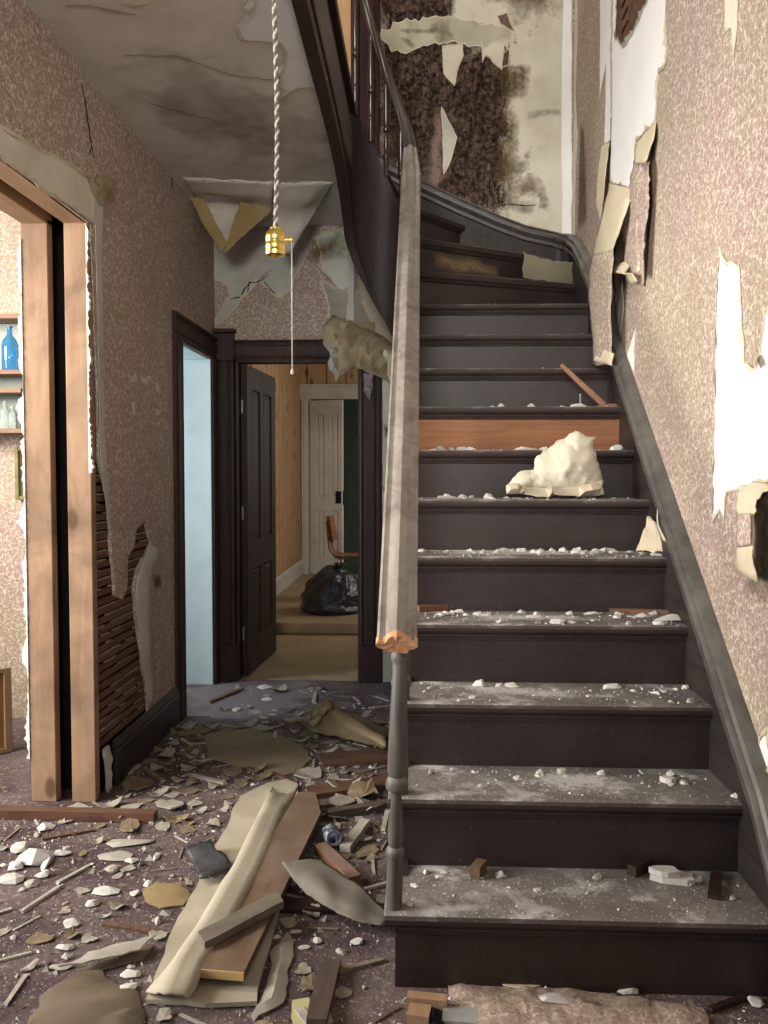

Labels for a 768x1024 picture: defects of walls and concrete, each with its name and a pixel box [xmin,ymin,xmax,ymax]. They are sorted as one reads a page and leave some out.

water stain [380,0,453,30]
crack [82,83,94,158]
water stain [380,31,535,212]
flaking render [595,0,667,220]
spalling [0,123,159,793]
crack [230,270,276,299]
flaking render [214,181,393,344]
peeling [612,259,637,375]
flaking render [711,247,768,527]